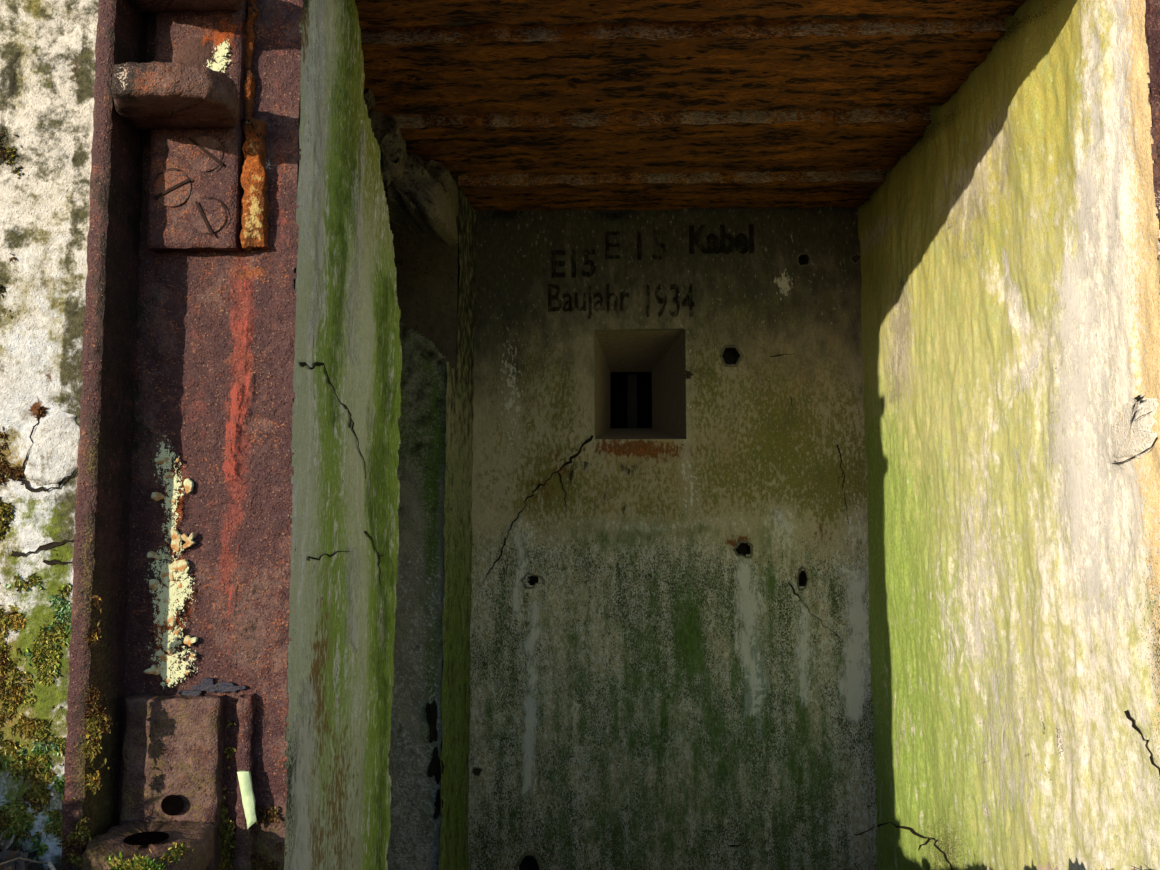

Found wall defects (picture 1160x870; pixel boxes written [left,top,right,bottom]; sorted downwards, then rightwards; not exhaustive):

corrosion [203,19,247,61]
crack [0,418,78,492]
crack [10,539,74,565]
corrosion [154,478,184,677]
crack [300,362,366,479]
water stain [510,532,542,795]
crack [474,435,593,593]
water stain [734,560,773,746]
water stain [784,599,814,706]
water stain [837,564,871,724]
water stain [290,680,318,870]
crack [854,822,952,870]